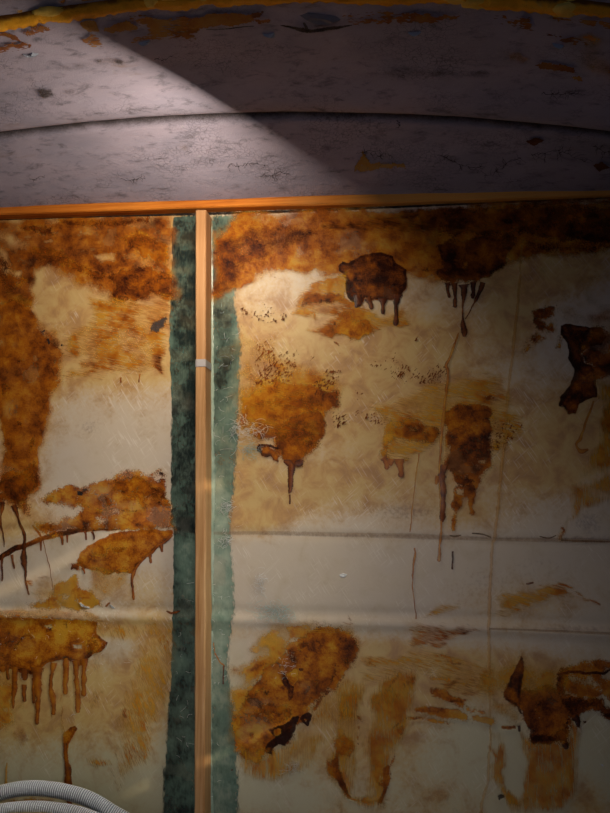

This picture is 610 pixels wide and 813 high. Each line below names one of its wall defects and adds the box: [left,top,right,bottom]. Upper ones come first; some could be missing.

peeling [0,25,50,43]
peeling [80,11,270,47]
corrosion [211,197,610,346]
corrosion [0,216,177,725]
corrosion [240,360,341,504]
corrosion [376,377,522,531]
corrosion [524,306,610,415]
corrosion [231,626,610,810]